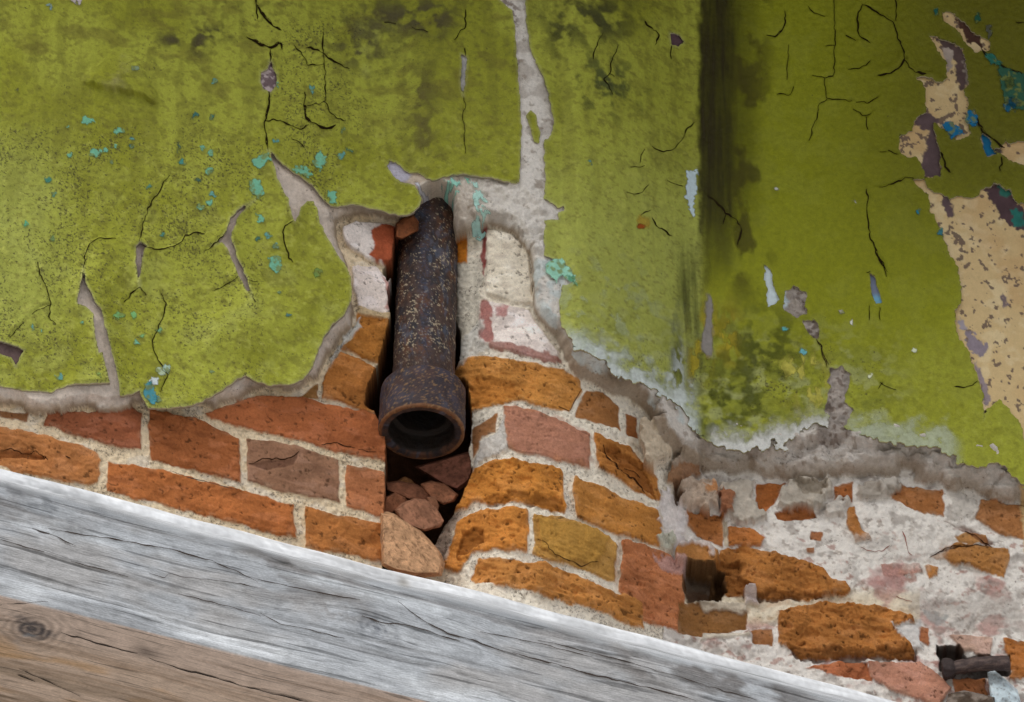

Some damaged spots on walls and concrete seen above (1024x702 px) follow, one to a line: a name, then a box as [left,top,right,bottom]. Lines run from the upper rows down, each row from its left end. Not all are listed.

crack [246,0,350,148]
water stain [698,0,736,236]
crack [767,0,926,140]
crack [139,175,225,250]
peeling [684,169,698,217]
peeling [899,7,1024,439]
crack [124,287,168,392]
flaking render [0,0,686,640]
water stain [572,336,696,430]
efflorescence [712,417,829,453]
flaking render [764,266,819,339]
flaking render [665,366,1024,702]